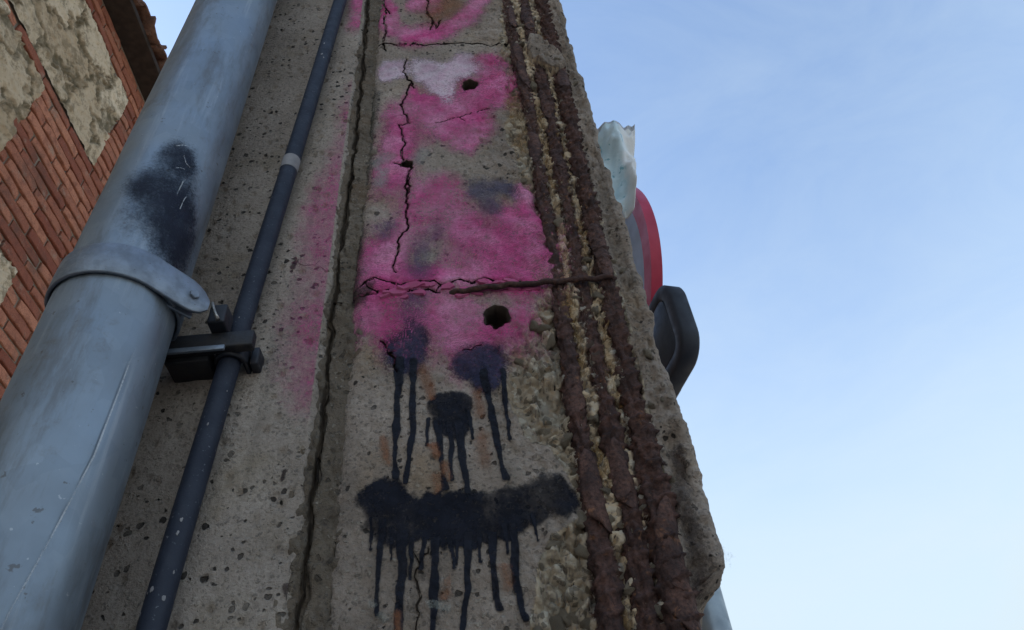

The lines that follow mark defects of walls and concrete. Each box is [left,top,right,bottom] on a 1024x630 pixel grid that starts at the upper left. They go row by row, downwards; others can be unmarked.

rust [508,4,565,187]
crack [294,0,541,630]
spalling [496,0,664,630]
rust [579,437,639,534]
rust [653,495,702,630]